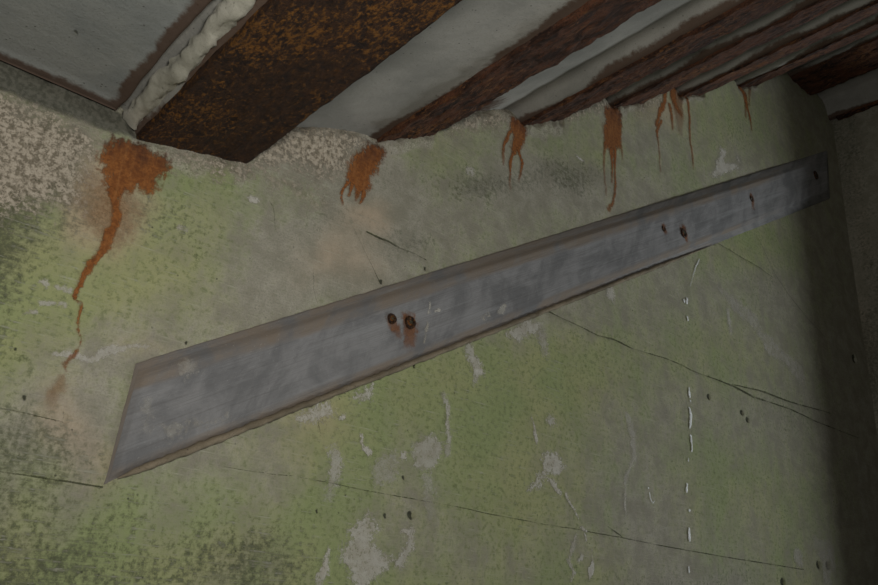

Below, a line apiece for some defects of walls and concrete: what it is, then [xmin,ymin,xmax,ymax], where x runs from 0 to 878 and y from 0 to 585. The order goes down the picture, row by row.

corrosion [340,141,387,204]
corrosion [502,116,526,181]
corrosion [602,105,623,212]
corrosion [655,88,694,166]
corrosion [65,134,172,369]
crack [581,327,851,435]
crack [17,473,103,488]
peeling [401,397,452,470]
peeling [528,451,566,492]
peeling [316,509,415,585]